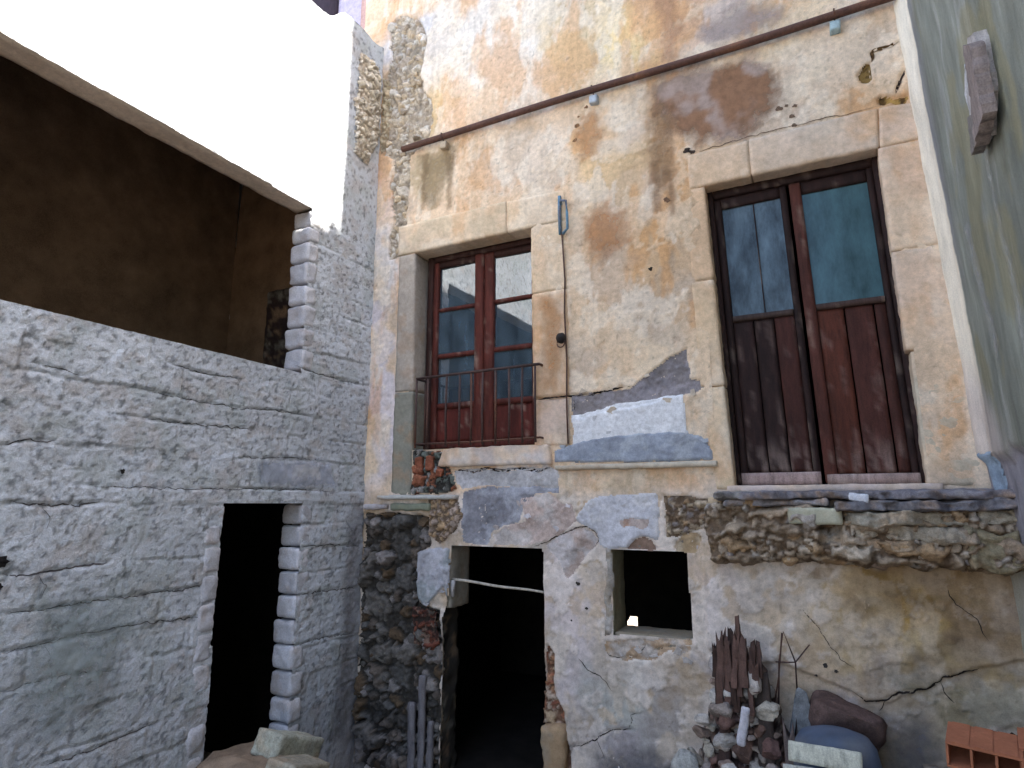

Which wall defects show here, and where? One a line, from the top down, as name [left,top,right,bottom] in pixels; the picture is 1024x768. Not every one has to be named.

flaking render [353,15,434,260]
water stain [651,60,779,201]
crack [703,107,873,151]
flaking render [858,43,895,84]
flaking render [878,71,908,106]
peeling [560,350,703,449]
peeling [414,456,577,546]
flaking render [664,496,708,553]
peeling [848,493,869,503]
flaking render [604,548,693,664]
crack [802,609,979,710]
crack [948,590,989,641]